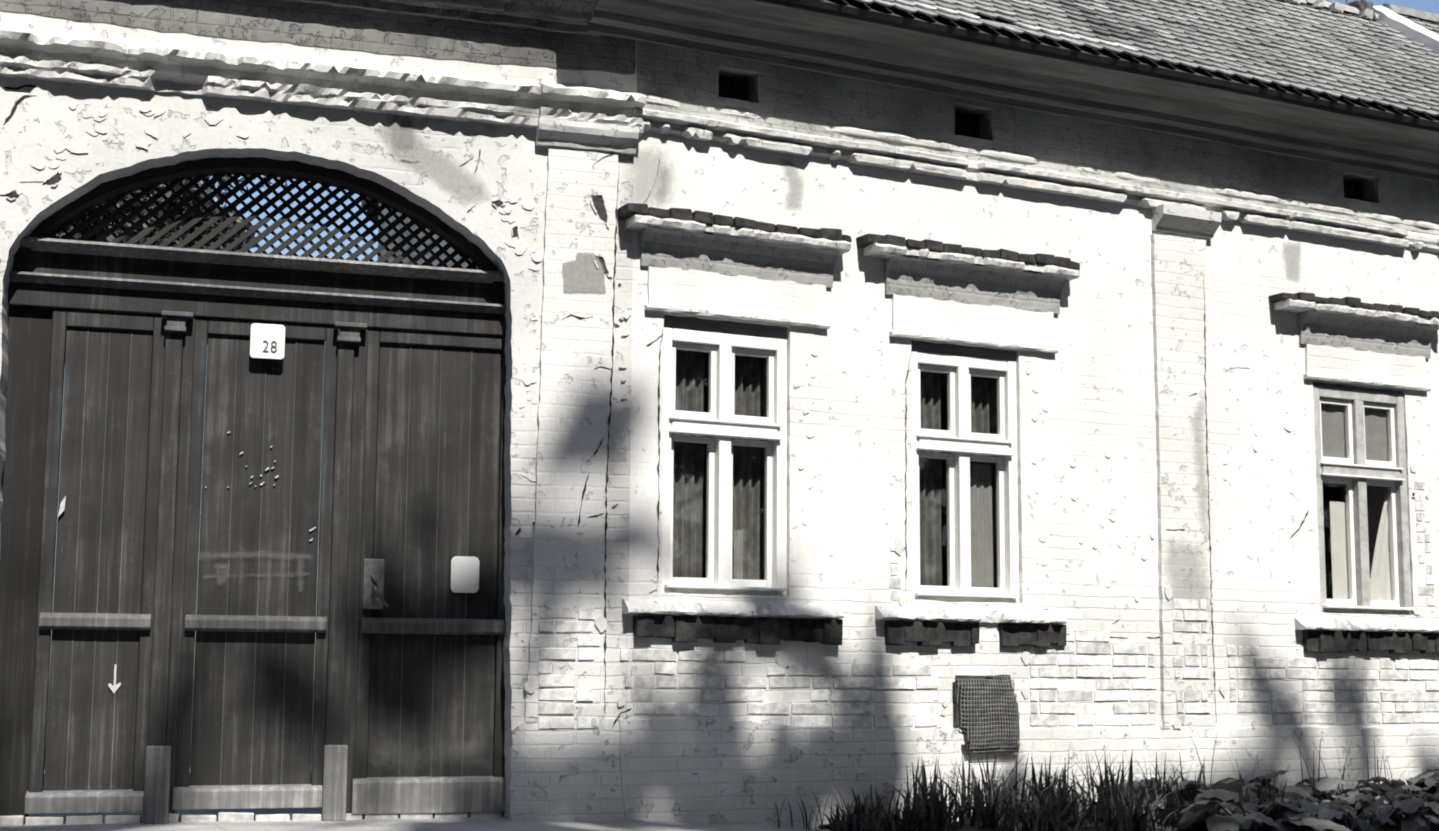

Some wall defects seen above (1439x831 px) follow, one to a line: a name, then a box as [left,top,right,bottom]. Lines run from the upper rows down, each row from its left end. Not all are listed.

flaking render [33,103,108,187]
flaking render [135,101,166,150]
spalling [6,188,19,201]